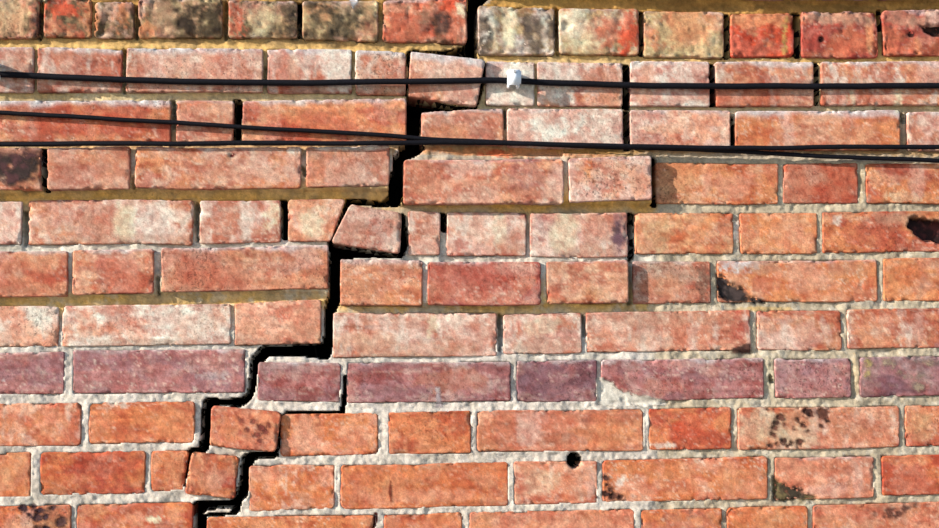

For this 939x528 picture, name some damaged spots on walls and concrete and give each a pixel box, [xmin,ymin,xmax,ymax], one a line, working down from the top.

water stain [0,147,42,187]
spalling [907,219,939,244]
crack [184,0,487,528]
spalling [716,274,765,304]